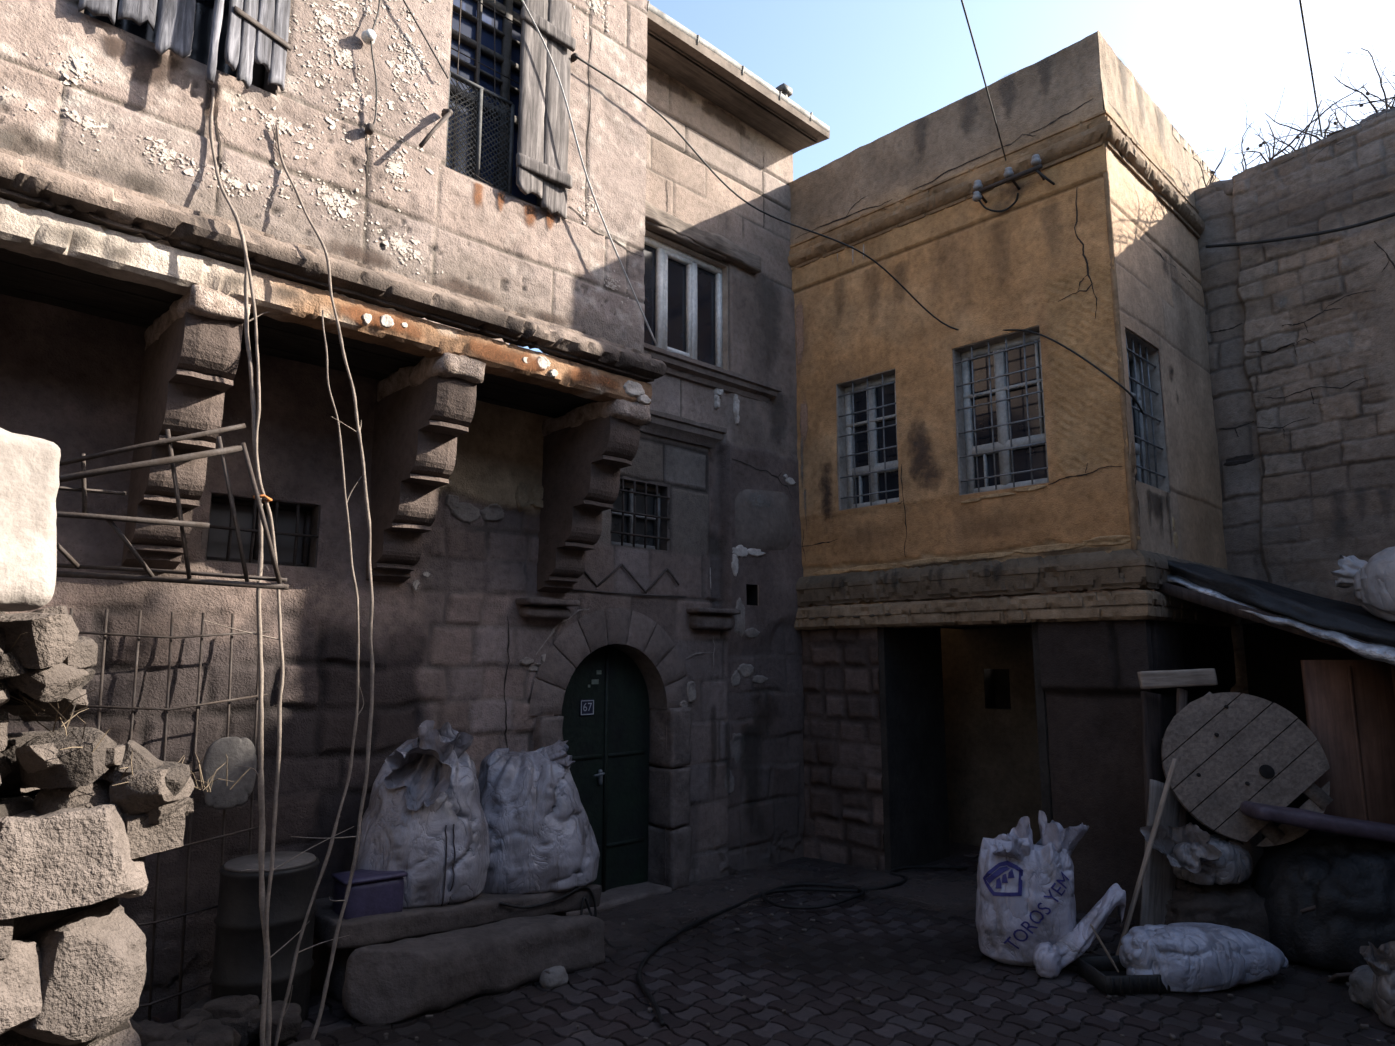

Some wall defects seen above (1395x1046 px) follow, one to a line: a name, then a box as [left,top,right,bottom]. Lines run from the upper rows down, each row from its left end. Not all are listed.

water stain [105,35,174,84]
water stain [206,83,221,116]
rust [475,183,504,210]
rust [526,205,554,229]
water stain [334,245,389,265]
crack [1058,189,1097,318]
water stain [442,278,495,301]
flaking render [363,313,407,329]
water stain [523,307,568,323]
flaking render [523,356,558,378]
water stain [909,426,939,487]
flaking render [731,545,766,576]